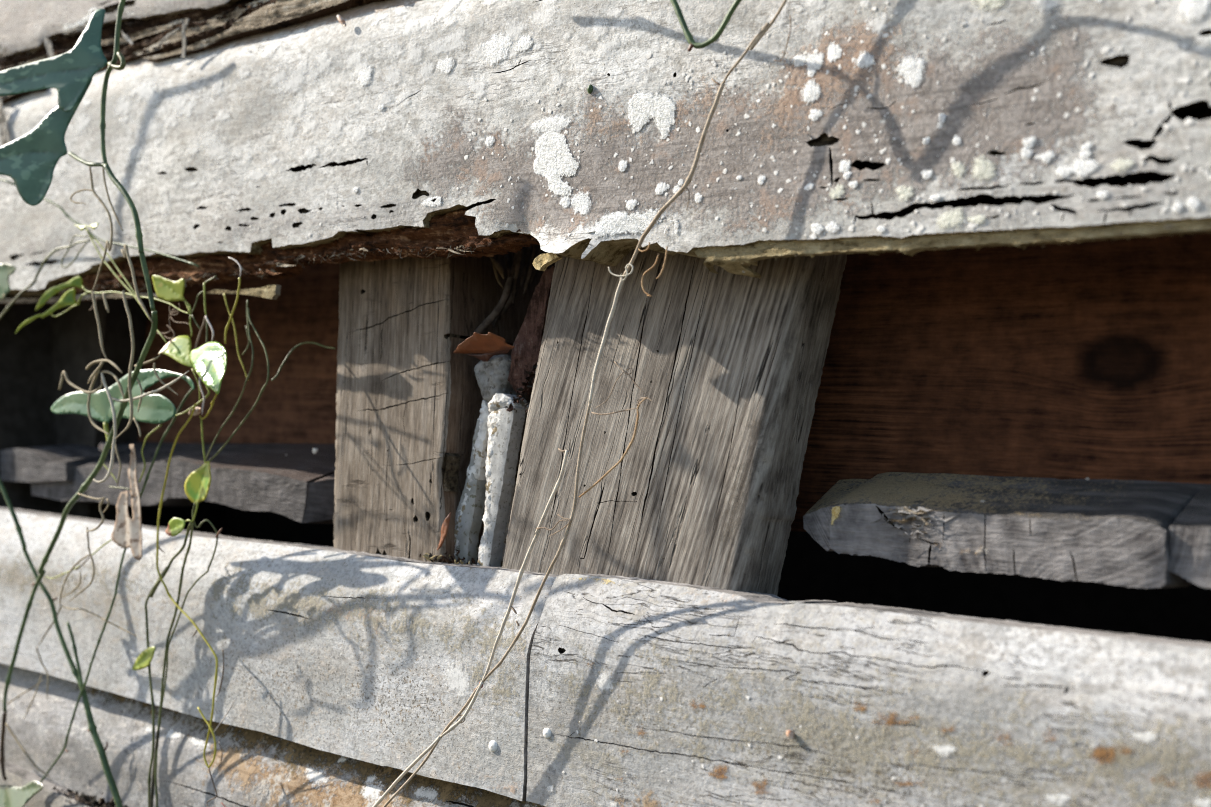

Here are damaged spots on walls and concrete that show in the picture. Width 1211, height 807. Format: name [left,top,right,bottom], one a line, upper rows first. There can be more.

peeling [44,38,54,57]
peeling [158,18,190,58]
peeling [402,10,1117,244]
crack [819,148,886,189]
crack [854,100,1211,223]
crack [541,257,1076,729]